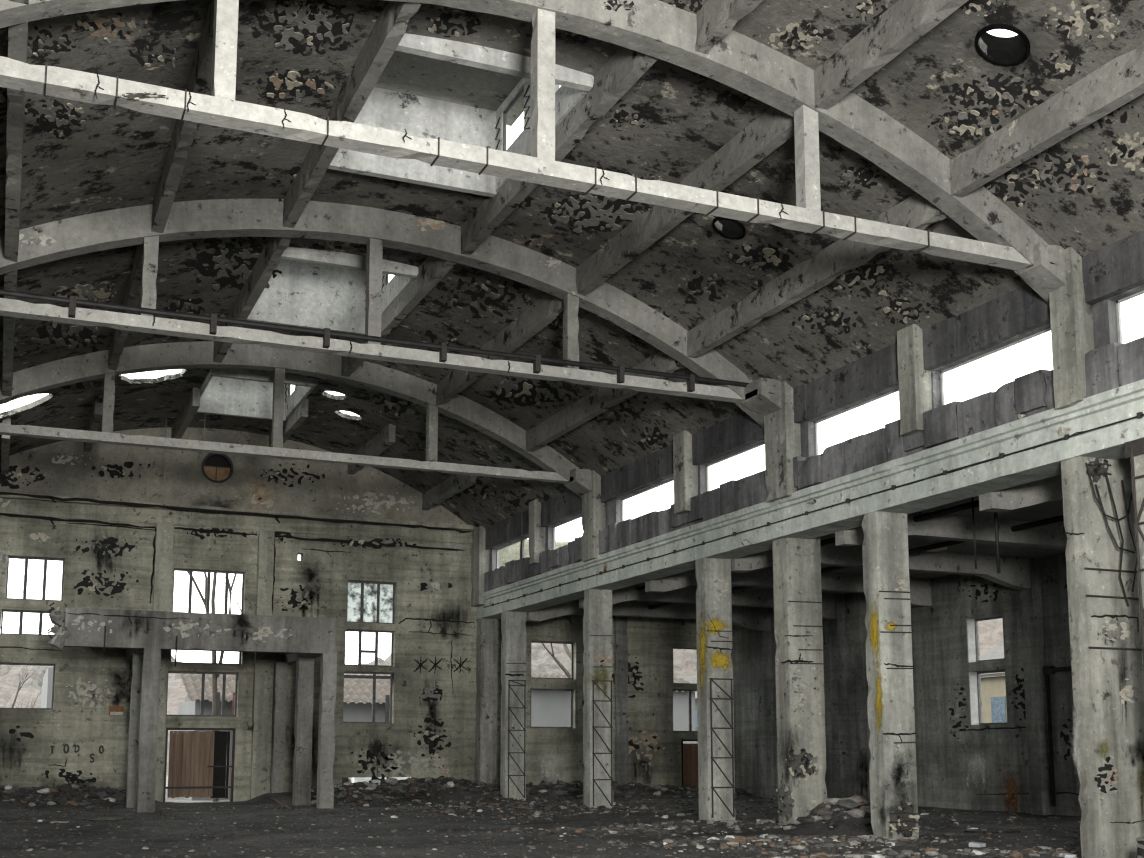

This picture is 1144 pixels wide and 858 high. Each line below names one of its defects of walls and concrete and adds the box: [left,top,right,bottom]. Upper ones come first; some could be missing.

spalling [775,746,818,821]